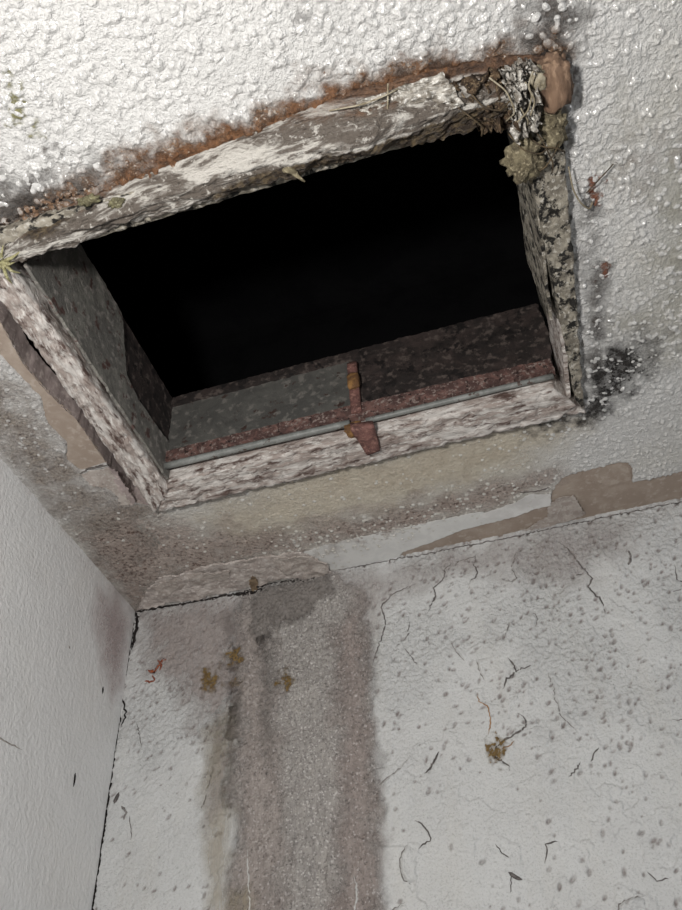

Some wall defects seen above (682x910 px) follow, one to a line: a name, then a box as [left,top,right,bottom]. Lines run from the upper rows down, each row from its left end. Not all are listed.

corrosion [476,38,517,63]
corrosion [16,53,461,222]
peeling [0,322,136,505]
leakage [0,265,658,598]
crack [91,699,141,910]
leakage [152,570,385,910]
crack [126,501,682,675]
crack [377,752,439,808]
peeling [136,462,682,611]
crack [451,629,531,687]
crack [494,713,527,770]